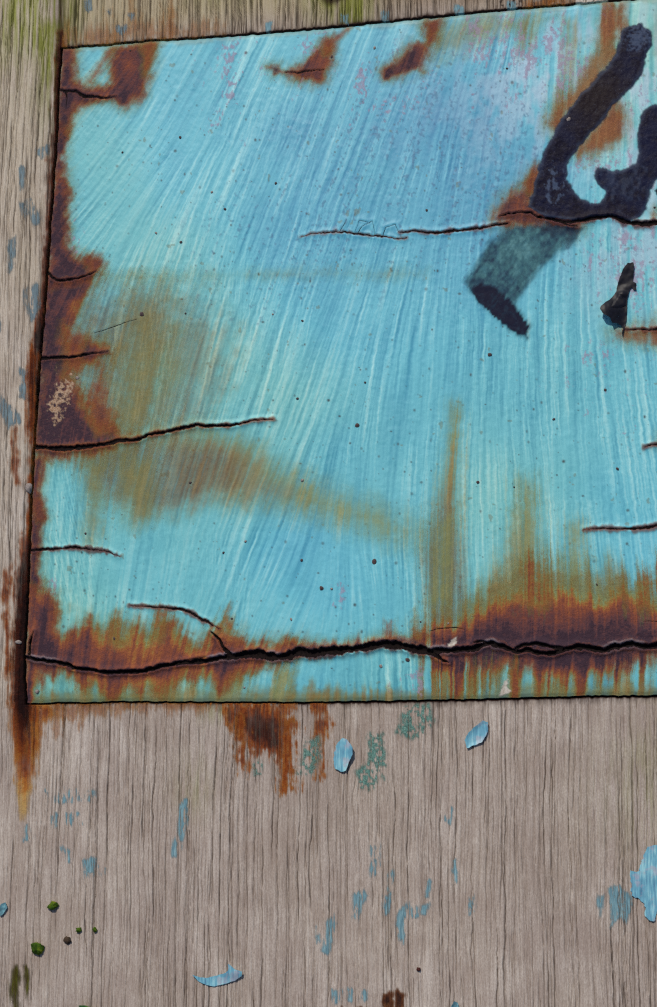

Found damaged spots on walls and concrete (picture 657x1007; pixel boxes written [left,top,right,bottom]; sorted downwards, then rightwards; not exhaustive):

rust [551,2,628,128]
crack [59,88,117,103]
crack [301,209,657,239]
crack [624,325,657,333]
rust [1,20,657,816]
crack [35,417,275,452]
crack [642,442,657,450]
crack [582,522,657,532]
crack [31,544,120,557]
crack [26,604,657,677]